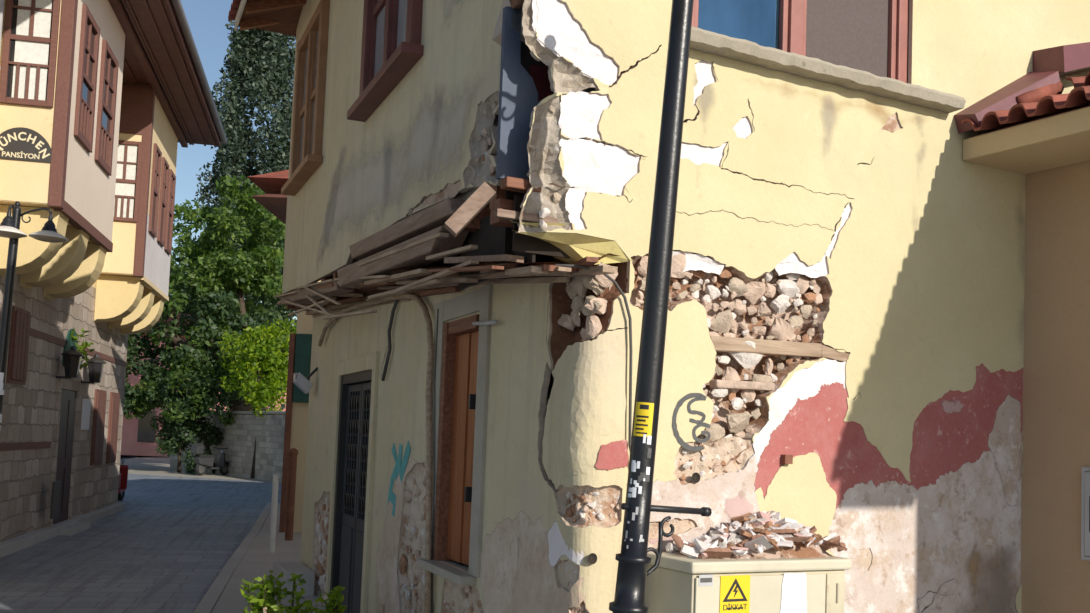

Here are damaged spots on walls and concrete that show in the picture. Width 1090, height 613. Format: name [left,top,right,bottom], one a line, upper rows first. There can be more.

spalling [518,0,640,233]
crack [610,52,655,87]
peeling [693,61,715,105]
peeling [680,117,752,166]
spalling [550,253,648,370]
peeling [595,440,629,470]
peeling [648,203,1023,613]
peeling [376,459,621,613]